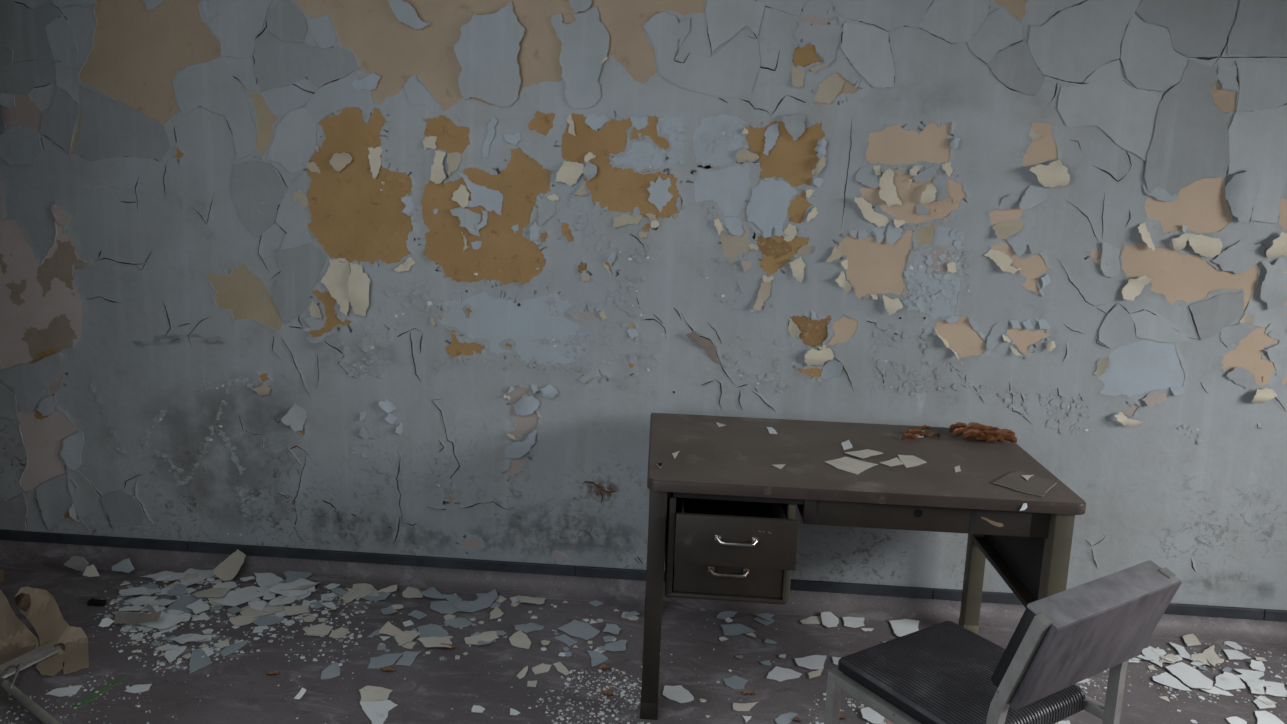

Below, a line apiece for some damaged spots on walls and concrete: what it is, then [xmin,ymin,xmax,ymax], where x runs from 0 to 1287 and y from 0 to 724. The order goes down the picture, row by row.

crack [75,0,374,399]
peeling [271,0,1070,365]
crack [658,0,1287,243]
crack [0,469,157,537]
crack [384,323,510,544]
peeling [497,381,558,482]
crack [634,296,777,412]
peeling [783,309,843,385]
peeling [879,455,927,468]
crack [947,258,1244,425]
peeling [1090,337,1193,426]
peeling [1082,169,1287,404]